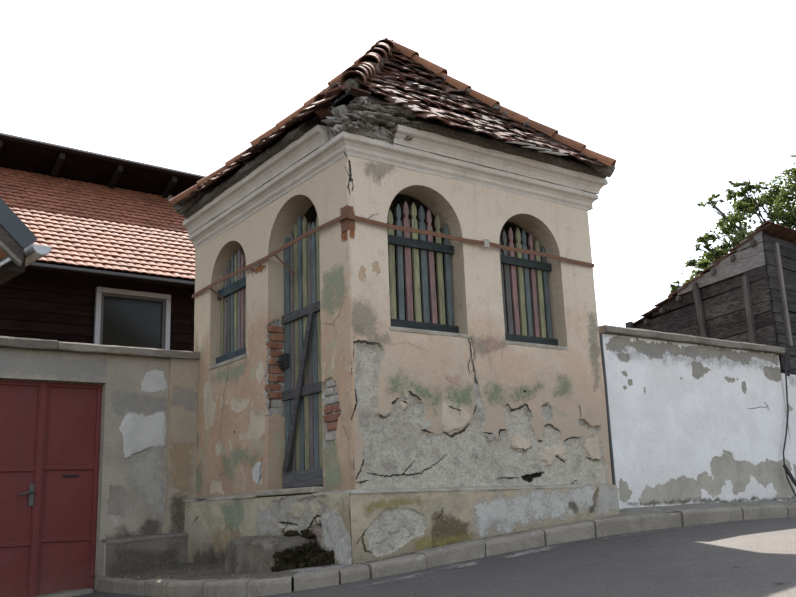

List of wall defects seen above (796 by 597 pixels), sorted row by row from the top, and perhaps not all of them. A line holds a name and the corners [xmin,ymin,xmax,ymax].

peeling [315,86,428,141]
rust [340,209,355,241]
flaking render [203,320,285,440]
crack [468,338,478,379]
peeling [724,376,747,395]
flaking render [322,378,341,449]
flaking render [351,340,608,489]
peeling [618,449,796,506]
flaking render [269,495,327,548]
flaking render [365,507,427,557]